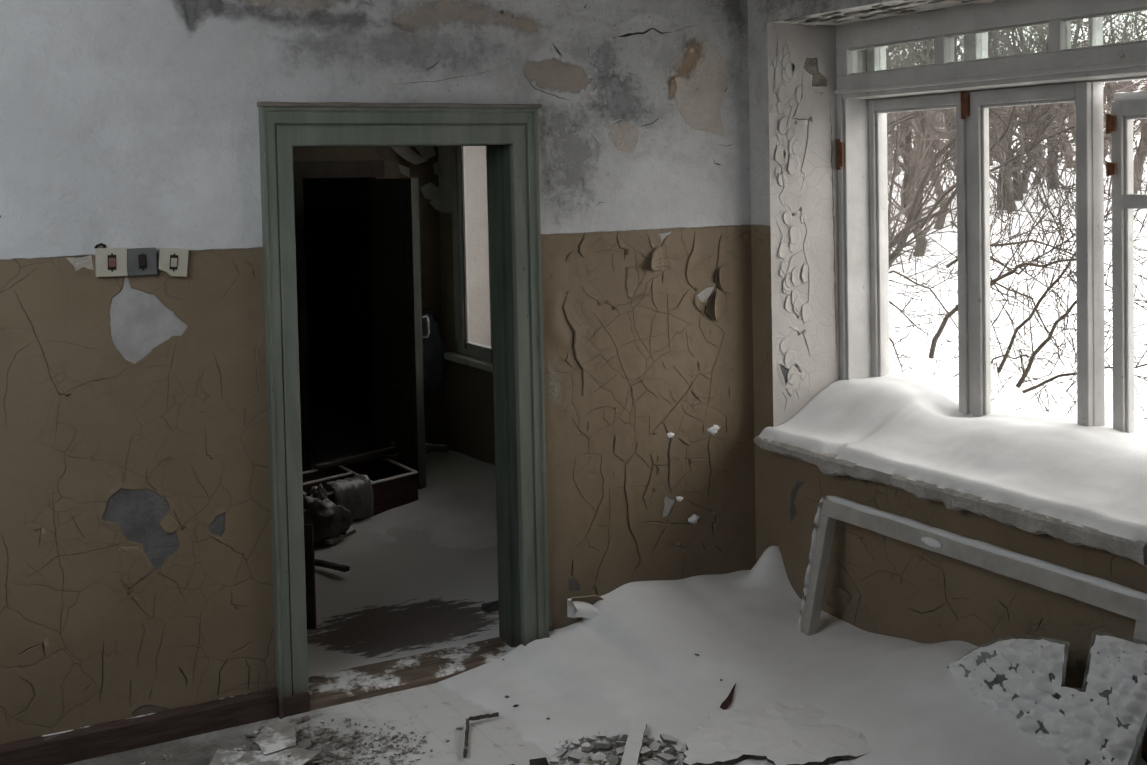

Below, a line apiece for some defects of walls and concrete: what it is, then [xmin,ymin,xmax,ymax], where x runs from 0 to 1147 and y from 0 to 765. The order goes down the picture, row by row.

peeling [774,0,1005,26]
flaking render [663,38,734,139]
peeling [772,44,831,187]
peeling [103,276,194,370]
crack [562,232,738,583]
peeling [625,227,676,299]
peeling [686,262,732,322]
peeling [776,339,805,397]
peeling [777,210,811,323]